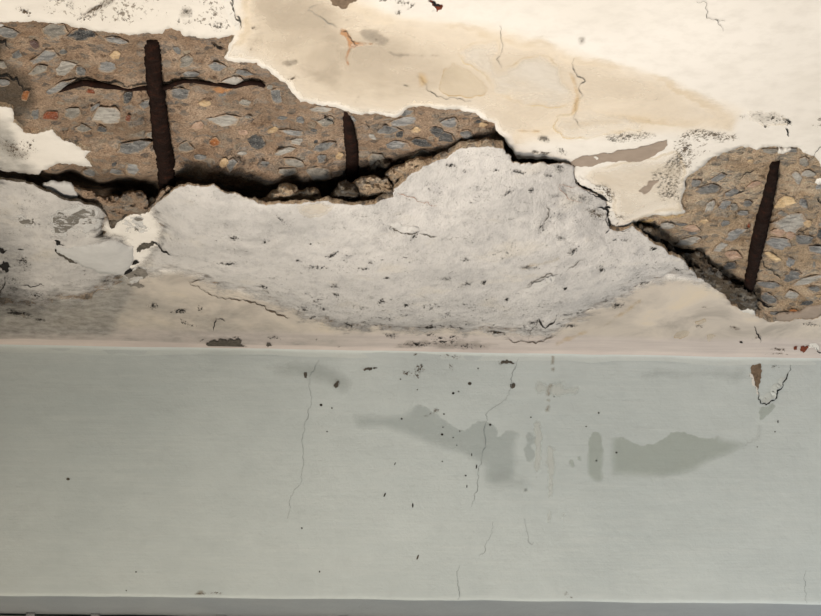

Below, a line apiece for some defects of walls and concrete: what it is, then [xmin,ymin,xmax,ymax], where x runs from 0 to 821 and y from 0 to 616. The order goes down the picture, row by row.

leakage [264,0,346,30]
leakage [272,61,473,112]
spalling [0,0,667,240]
crack [559,176,631,234]
crack [390,222,434,238]
spalling [634,146,821,321]
peeling [125,267,148,288]
crack [524,261,579,292]
peeling [749,363,762,395]
crack [758,368,791,405]
crack [472,319,556,503]